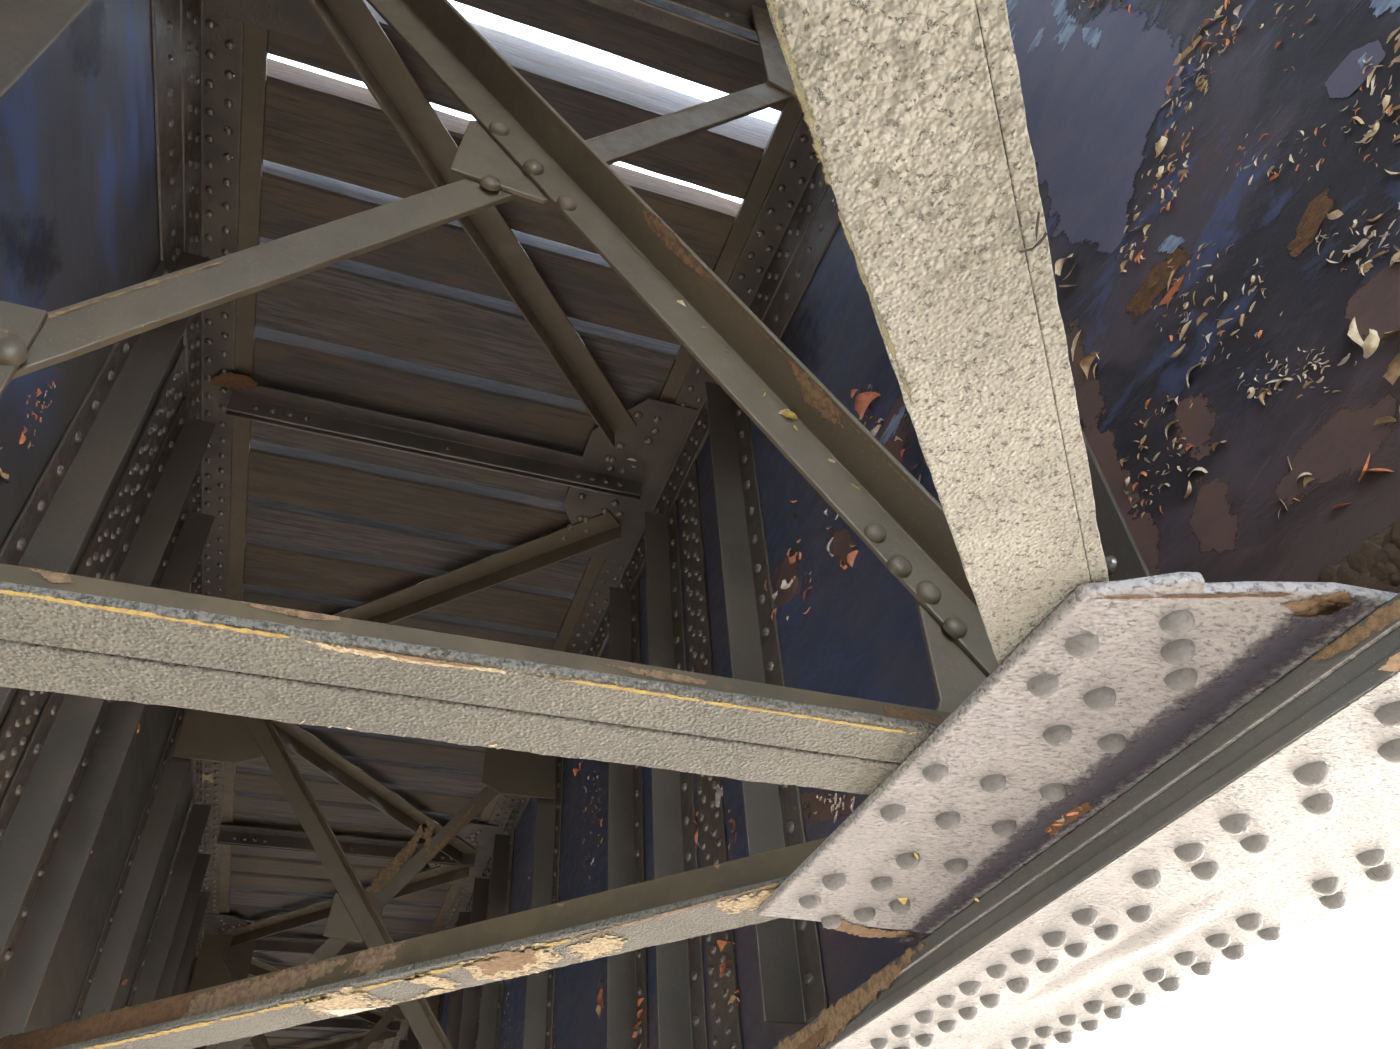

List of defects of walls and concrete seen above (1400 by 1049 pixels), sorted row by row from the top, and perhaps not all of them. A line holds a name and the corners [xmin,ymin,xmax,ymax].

peeling [1006,0,1242,287]
peeling [1226,27,1400,185]
peeling [0,381,56,450]
peeling [851,384,929,483]
peeling [1066,202,1400,576]
peeling [824,508,858,570]
rust [1097,519,1400,662]
rust [1379,652,1400,673]
peeling [709,888,777,915]
peeling [298,934,630,1048]
peeling [717,931,740,1005]
rust [778,915,925,1049]